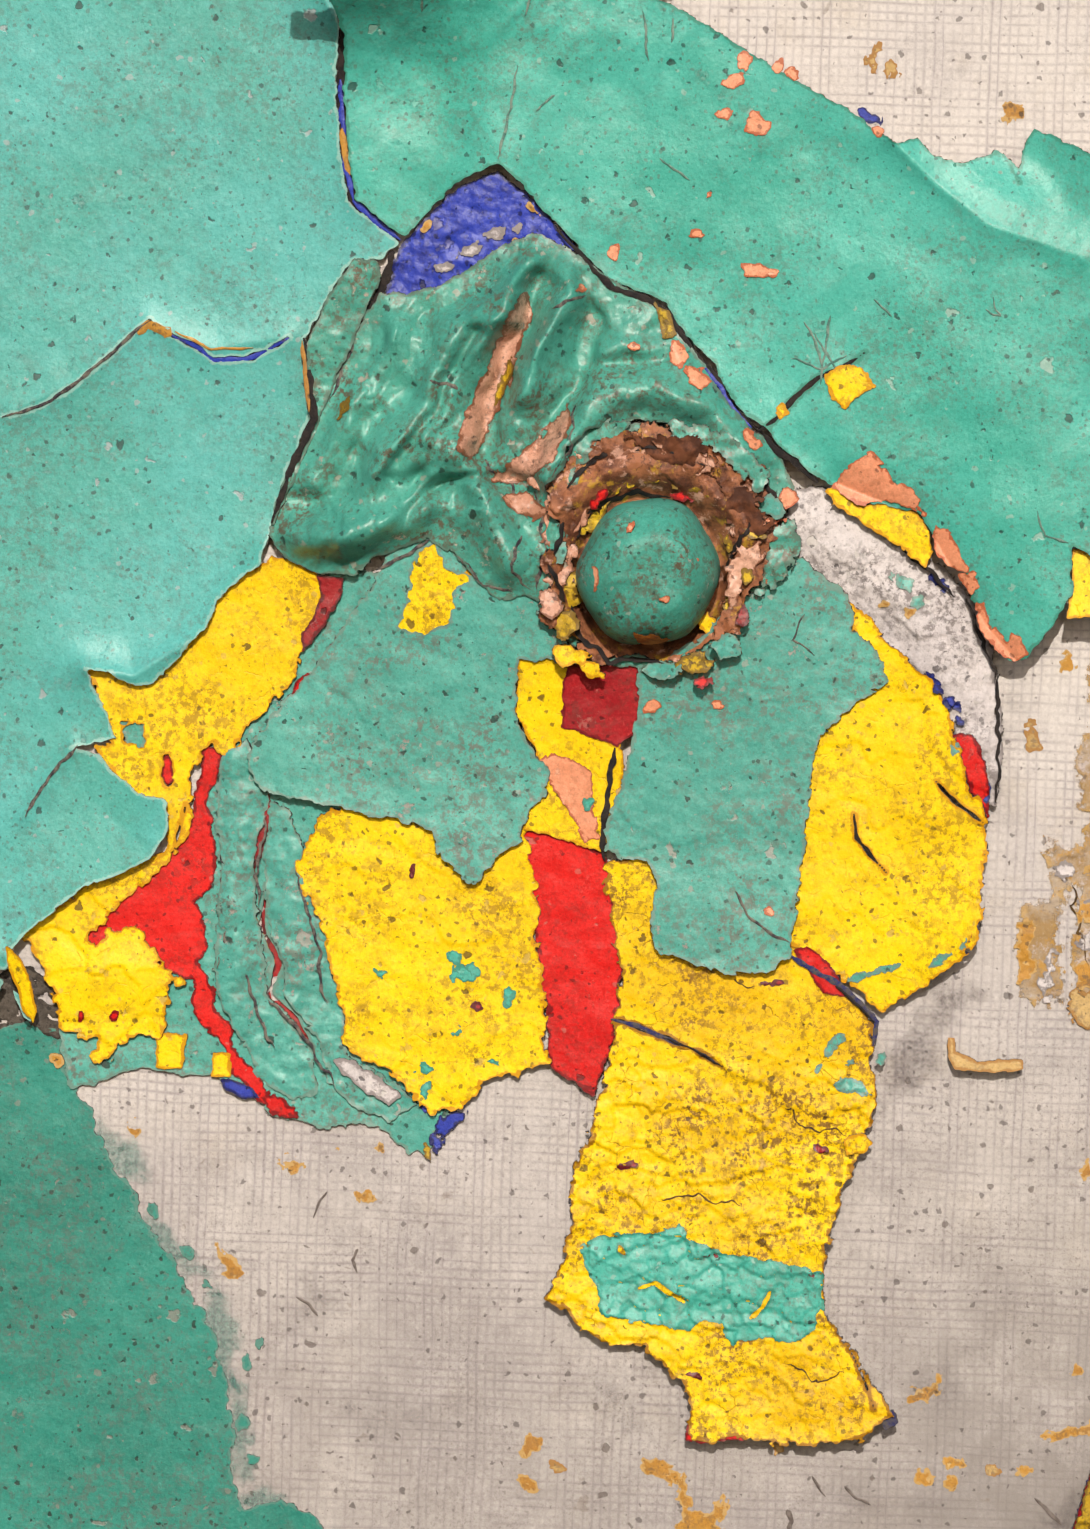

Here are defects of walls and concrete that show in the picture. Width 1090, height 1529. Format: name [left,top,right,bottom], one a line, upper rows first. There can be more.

crack [335,28,401,241]
peeling [385,170,575,295]
crack [2,320,318,523]
peeling [776,402,790,419]
peeling [824,364,876,409]
rust [527,418,802,690]
peeling [0,484,1005,1160]
peeling [1013,899,1090,1030]
crack [610,1018,723,1067]
peeling [947,1038,1024,1073]
peeling [242,1336,264,1371]
peeling [1072,1475,1090,1529]